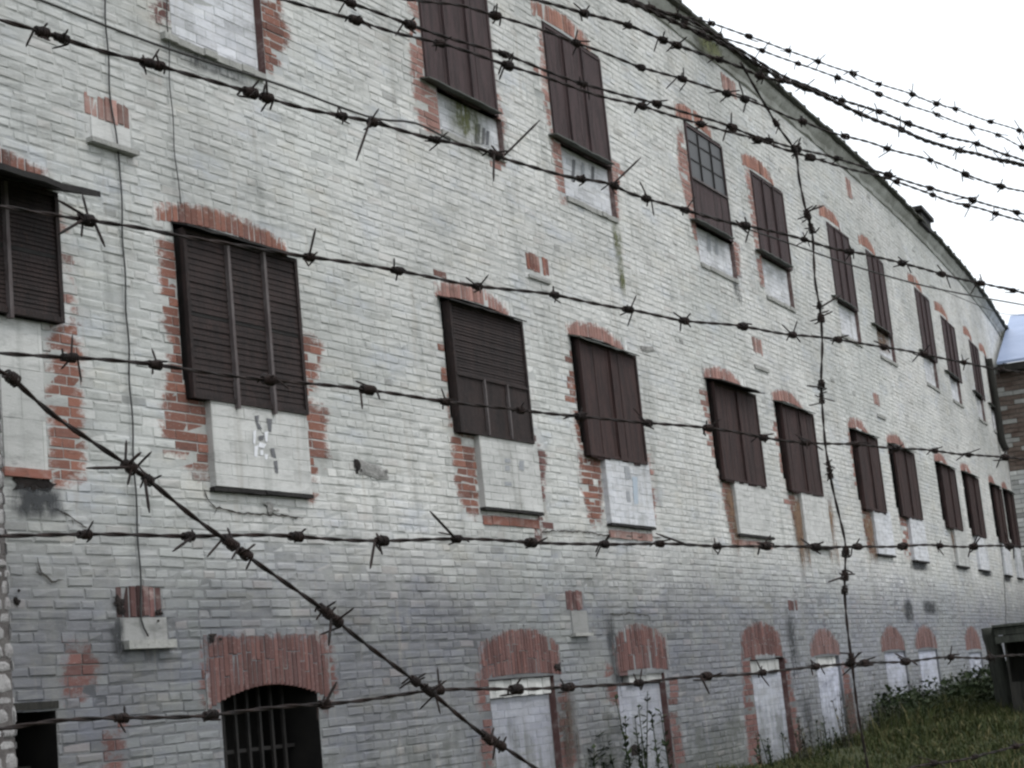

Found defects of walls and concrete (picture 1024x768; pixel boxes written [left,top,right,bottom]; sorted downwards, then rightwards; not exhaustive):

peeling [398,1,449,149]
leakage [614,227,625,288]
peeling [13,203,104,503]
peeling [142,222,211,491]
leakage [15,487,61,515]
peeling [714,475,745,551]